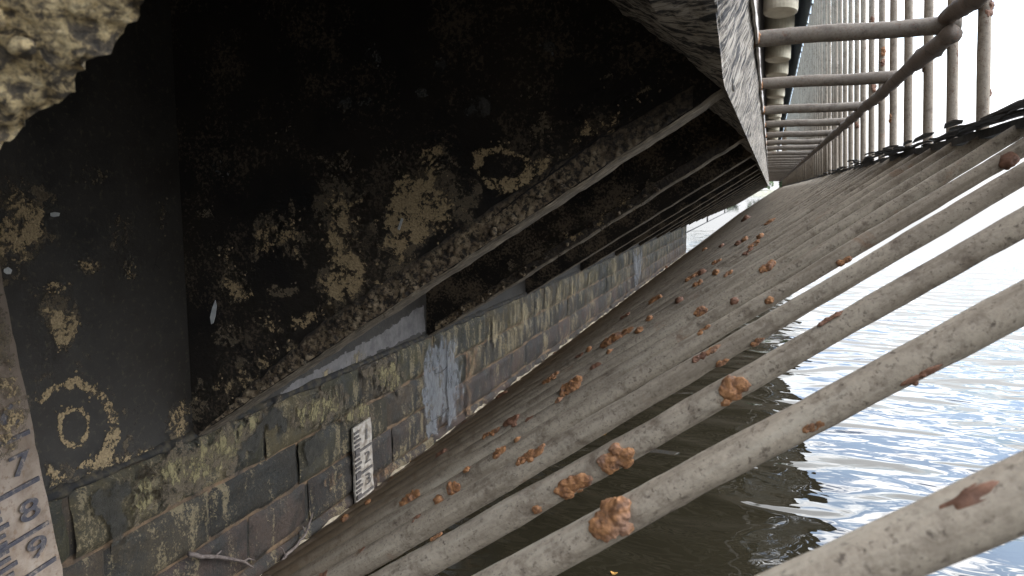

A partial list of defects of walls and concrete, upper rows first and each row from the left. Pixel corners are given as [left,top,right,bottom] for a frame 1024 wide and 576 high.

spalling [0,0,144,149]